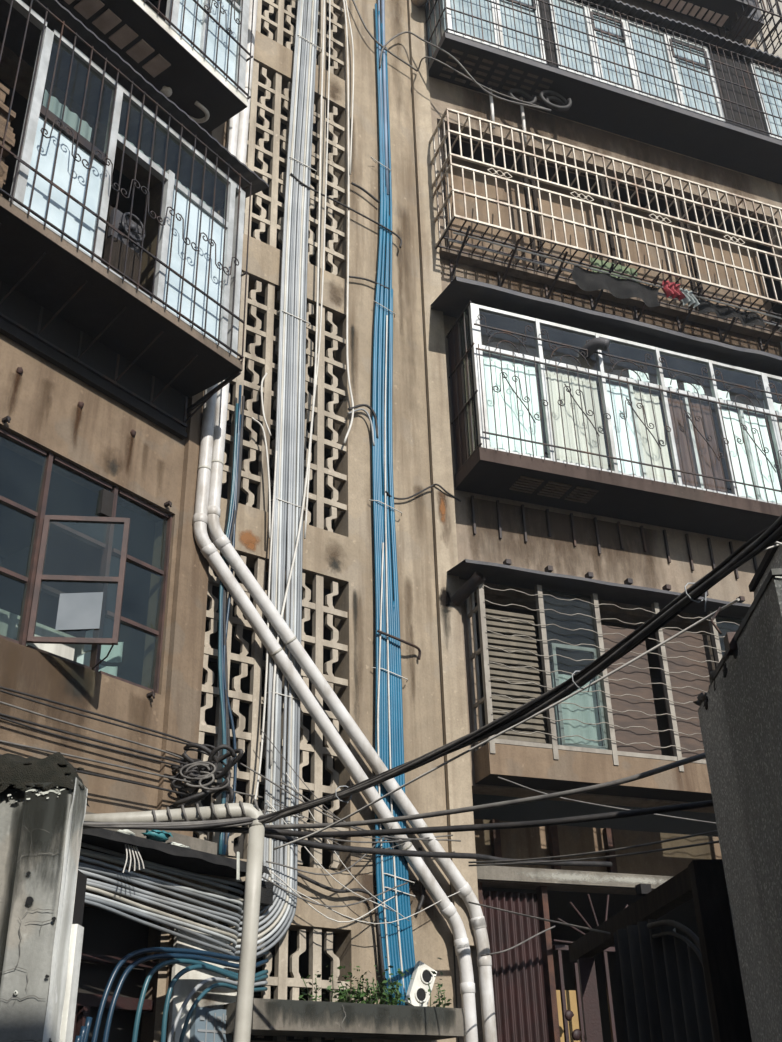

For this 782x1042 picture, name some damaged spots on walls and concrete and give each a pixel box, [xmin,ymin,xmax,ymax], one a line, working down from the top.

rust [240,532,258,550]
peeling [7,786,66,802]
water stain [0,779,87,975]